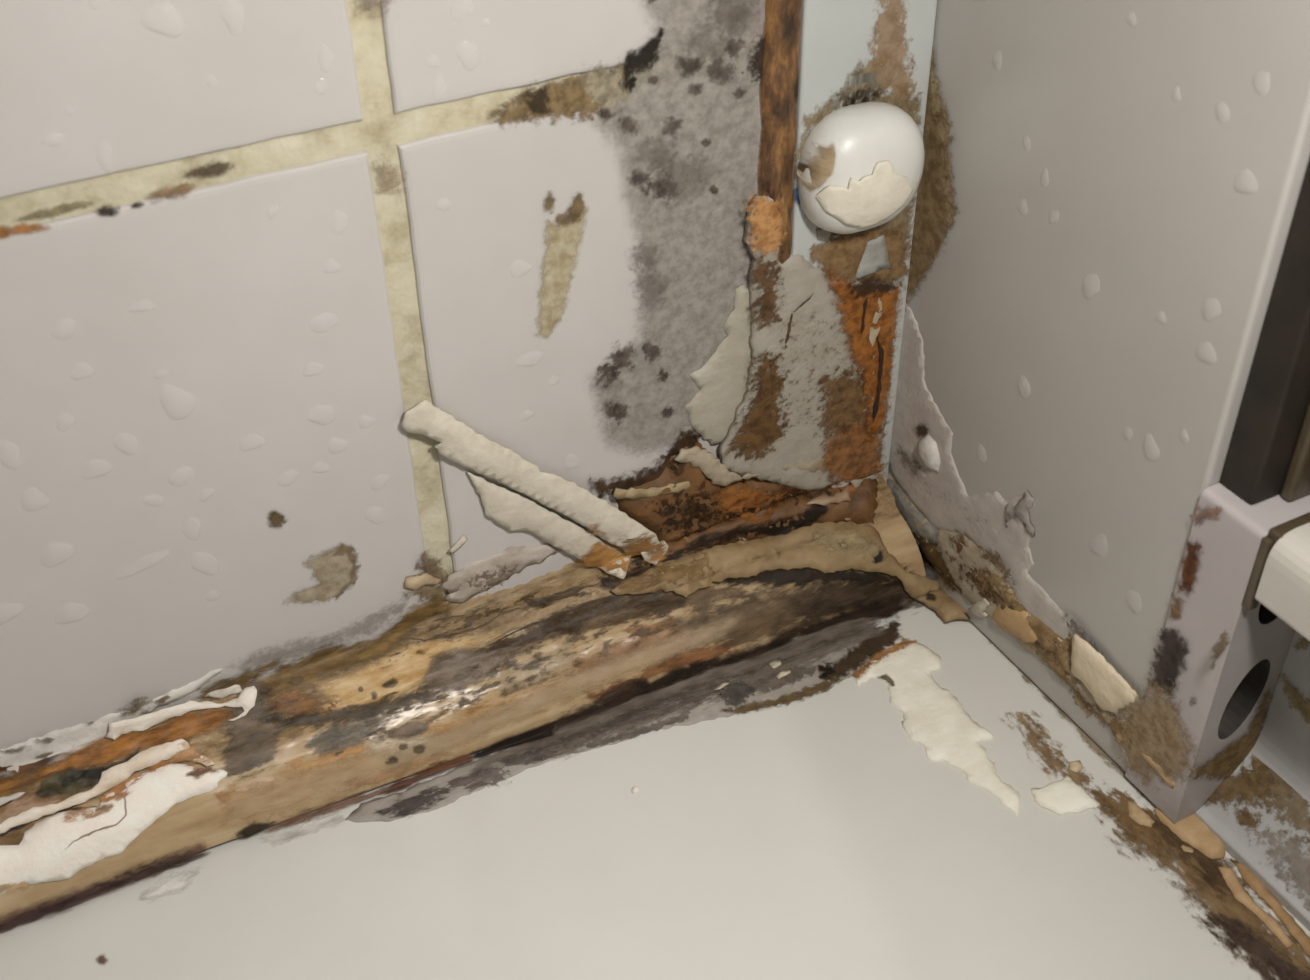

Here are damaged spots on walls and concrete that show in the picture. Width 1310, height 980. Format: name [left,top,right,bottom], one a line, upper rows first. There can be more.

damp [0,162,235,239]
damp [491,0,765,499]
flaking render [401,194,1139,715]
peeling [0,659,279,777]
peeling [852,639,1100,816]
peeling [0,739,228,895]